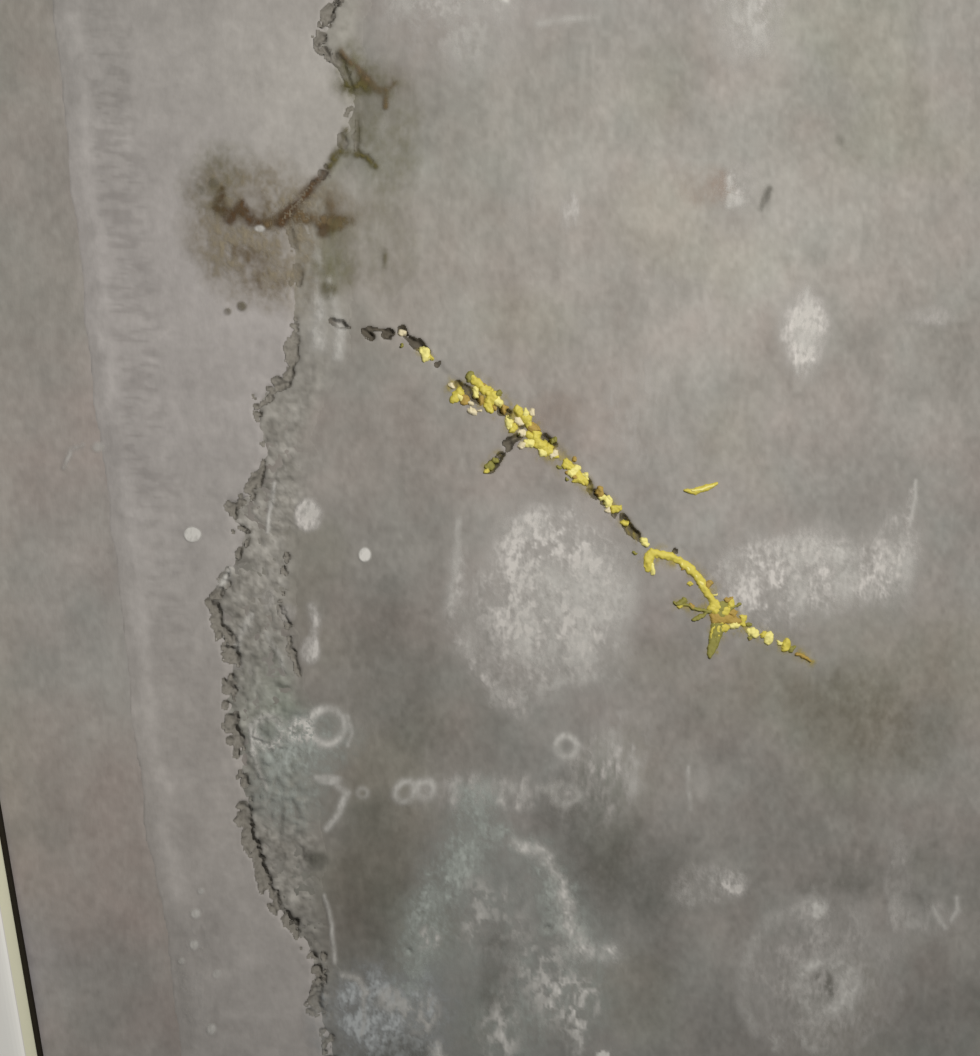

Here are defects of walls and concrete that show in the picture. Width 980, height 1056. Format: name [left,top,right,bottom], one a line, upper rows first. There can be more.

crack [286,226,304,287]
crack [311,0,374,182]
water stain [328,148,378,168]
crack [205,316,335,1056]
spalling [213,0,372,1056]
crack [329,317,814,663]